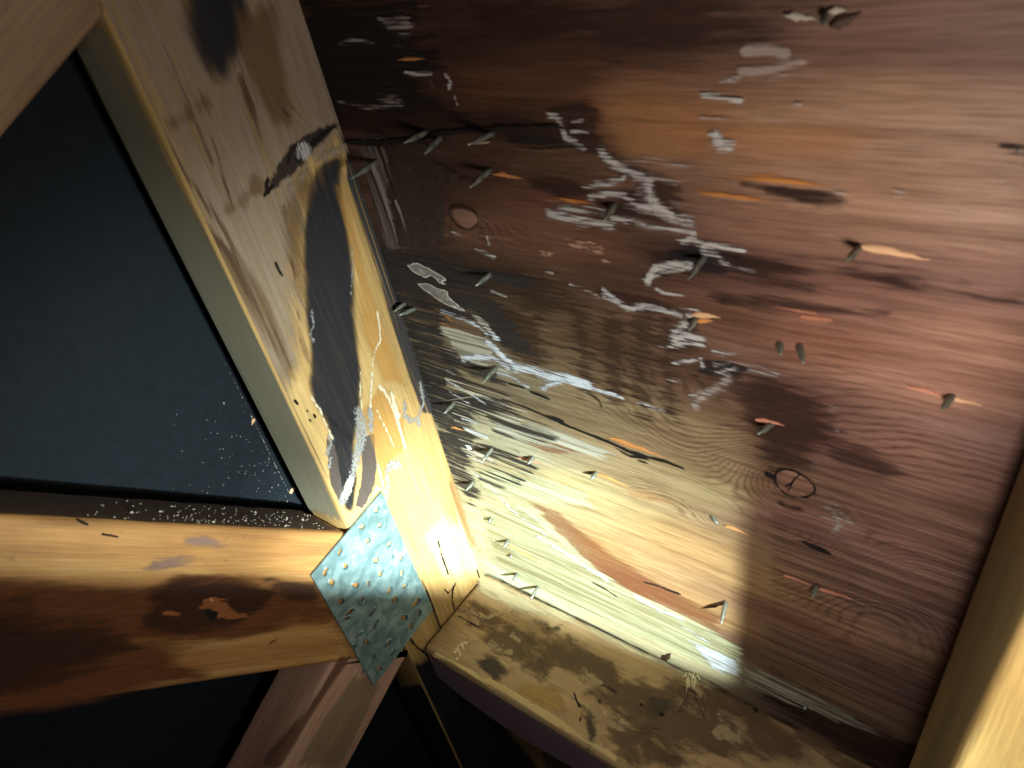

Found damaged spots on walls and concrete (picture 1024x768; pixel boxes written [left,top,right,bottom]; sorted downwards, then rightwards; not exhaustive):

leakage [189,0,301,125]
crack [263,124,578,197]
leakage [172,148,292,370]
leakage [282,0,901,676]
leakage [862,275,912,289]
crack [502,383,685,469]
leakage [0,576,331,712]
leakage [400,659,536,768]
leakage [453,601,915,768]